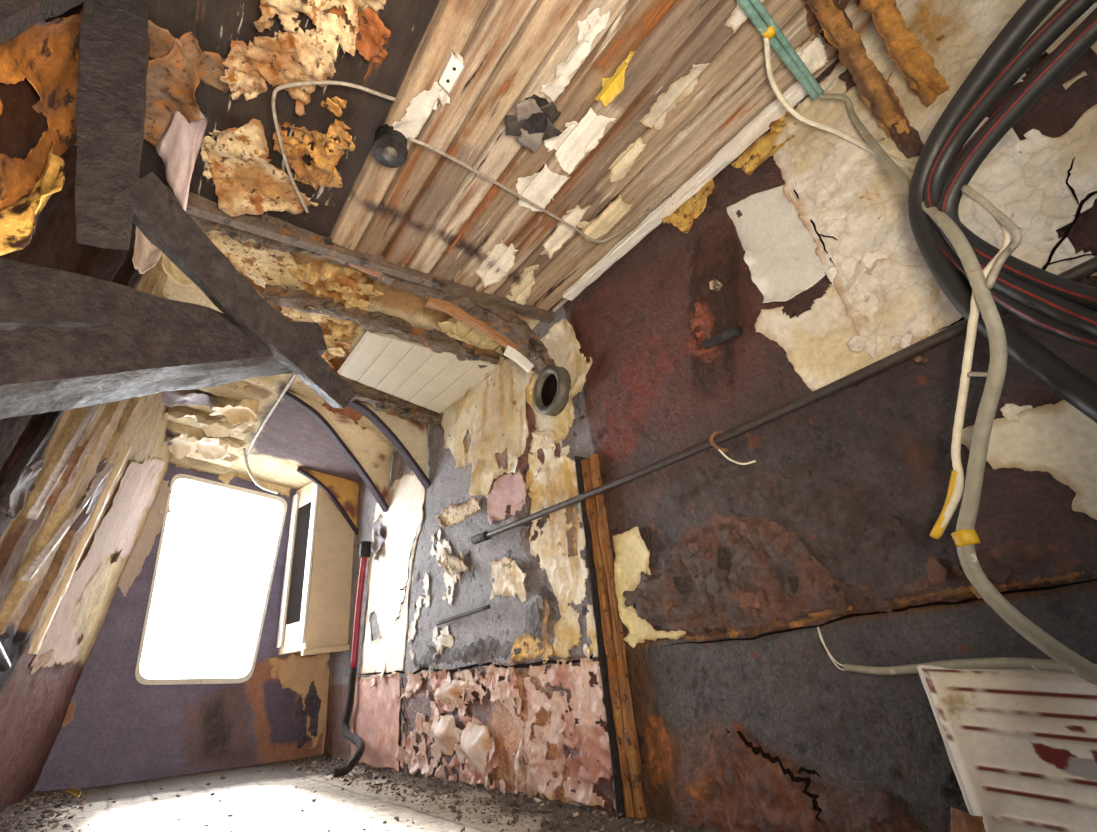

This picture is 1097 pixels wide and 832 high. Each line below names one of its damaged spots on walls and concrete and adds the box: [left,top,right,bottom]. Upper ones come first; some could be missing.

peeling [144,0,391,217]
peeling [475,50,715,315]
peeling [724,0,1026,391]
peeling [958,104,1097,275]
crack [1042,157,1097,270]
crack [934,317,965,332]
peeling [348,317,616,810]
rust [623,453,982,642]
crack [660,579,1097,647]
rust [294,681,322,749]
rust [646,716,825,832]
rust [950,807,985,832]